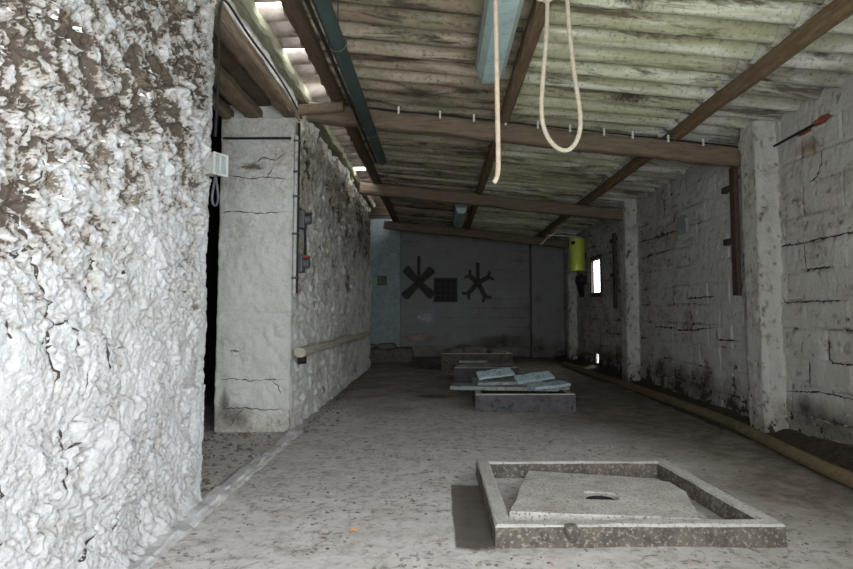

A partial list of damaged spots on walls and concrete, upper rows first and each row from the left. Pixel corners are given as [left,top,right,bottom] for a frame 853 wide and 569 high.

flaking render [50,1,83,44]
flaking render [125,68,162,99]
flaking render [36,158,69,200]
flaking render [78,140,124,172]
crack [231,155,290,180]
flaking render [119,190,154,213]
crack [84,241,95,300]
crack [0,208,80,391]
crack [58,430,83,494]
crack [78,511,120,562]